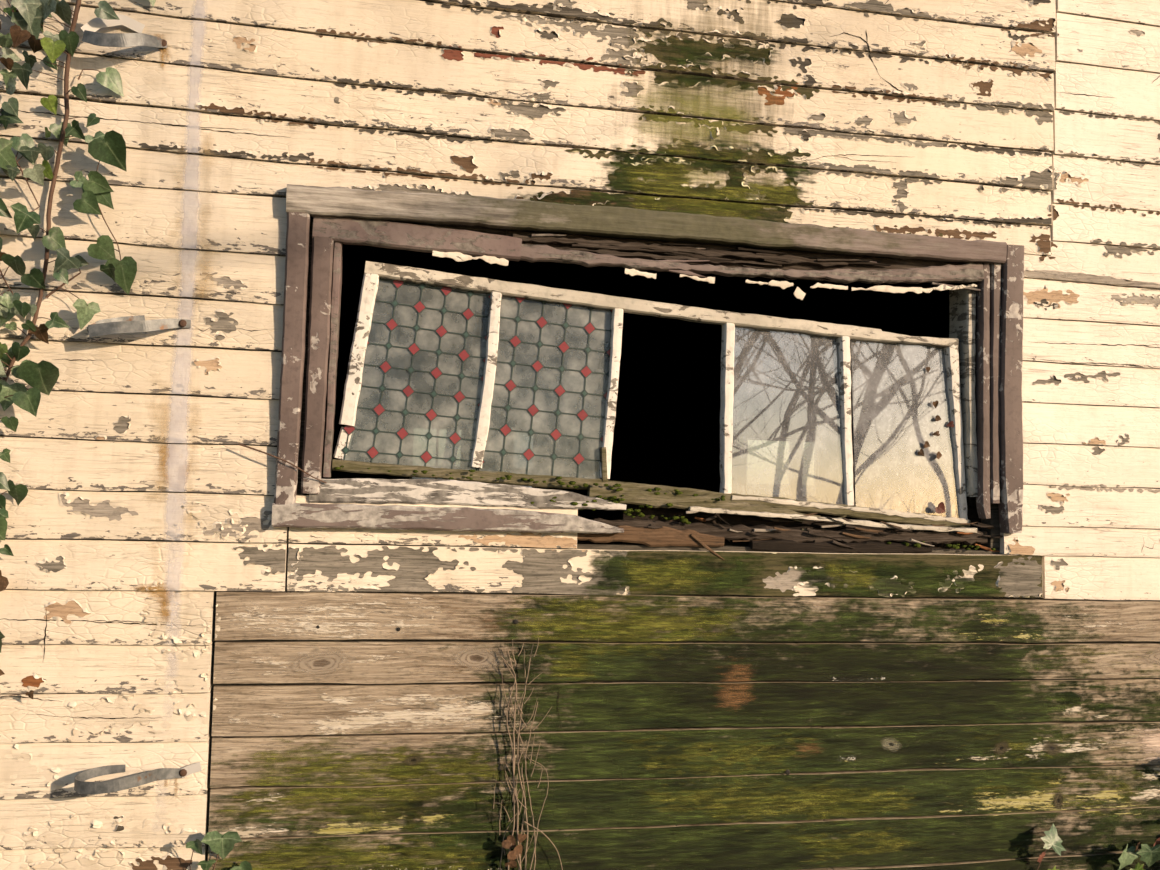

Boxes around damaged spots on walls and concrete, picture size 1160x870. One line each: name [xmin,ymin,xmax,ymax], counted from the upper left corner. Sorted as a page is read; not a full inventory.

crack [830,32,902,92]
leakage [657,34,774,179]
peeling [139,0,1160,310]
peeling [1032,371,1120,386]
peeling [58,492,138,521]
peeling [181,500,627,595]
leakage [786,554,1004,597]
peeling [64,581,221,742]
leakage [651,783,913,827]
leakage [1028,737,1160,870]
peeling [20,813,205,870]
leakage [215,838,482,870]